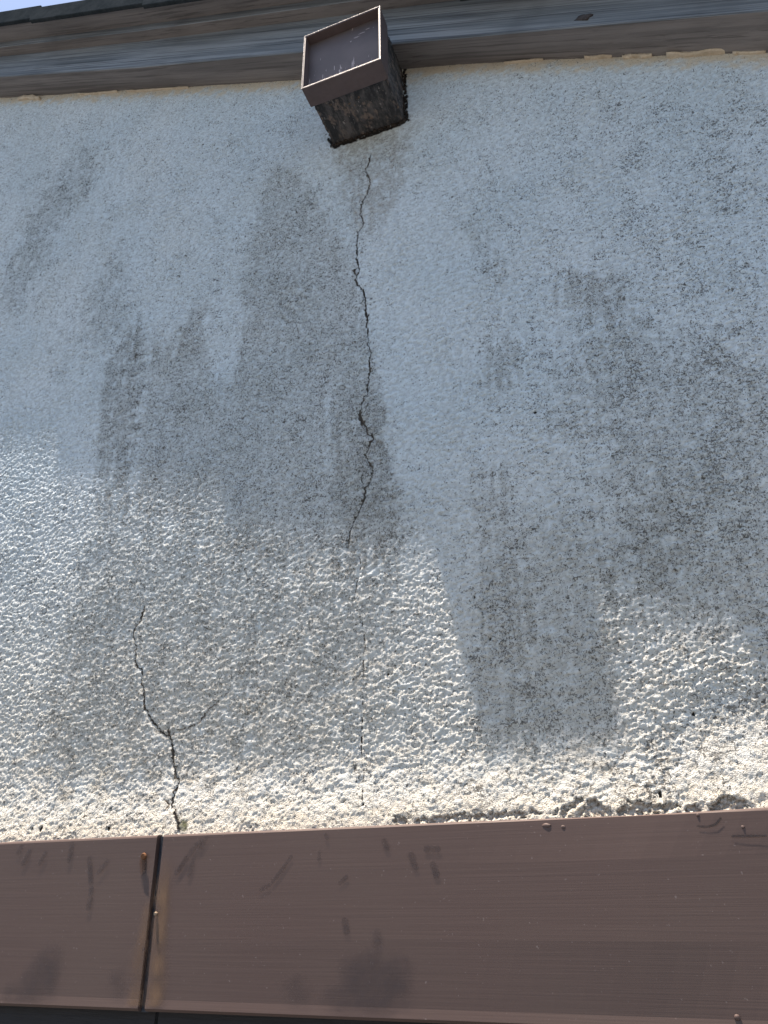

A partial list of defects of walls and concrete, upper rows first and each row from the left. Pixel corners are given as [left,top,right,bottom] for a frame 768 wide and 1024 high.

crack [133,607,229,830]
leakage [30,165,421,801]
crack [348,155,374,598]
leakage [474,268,768,769]